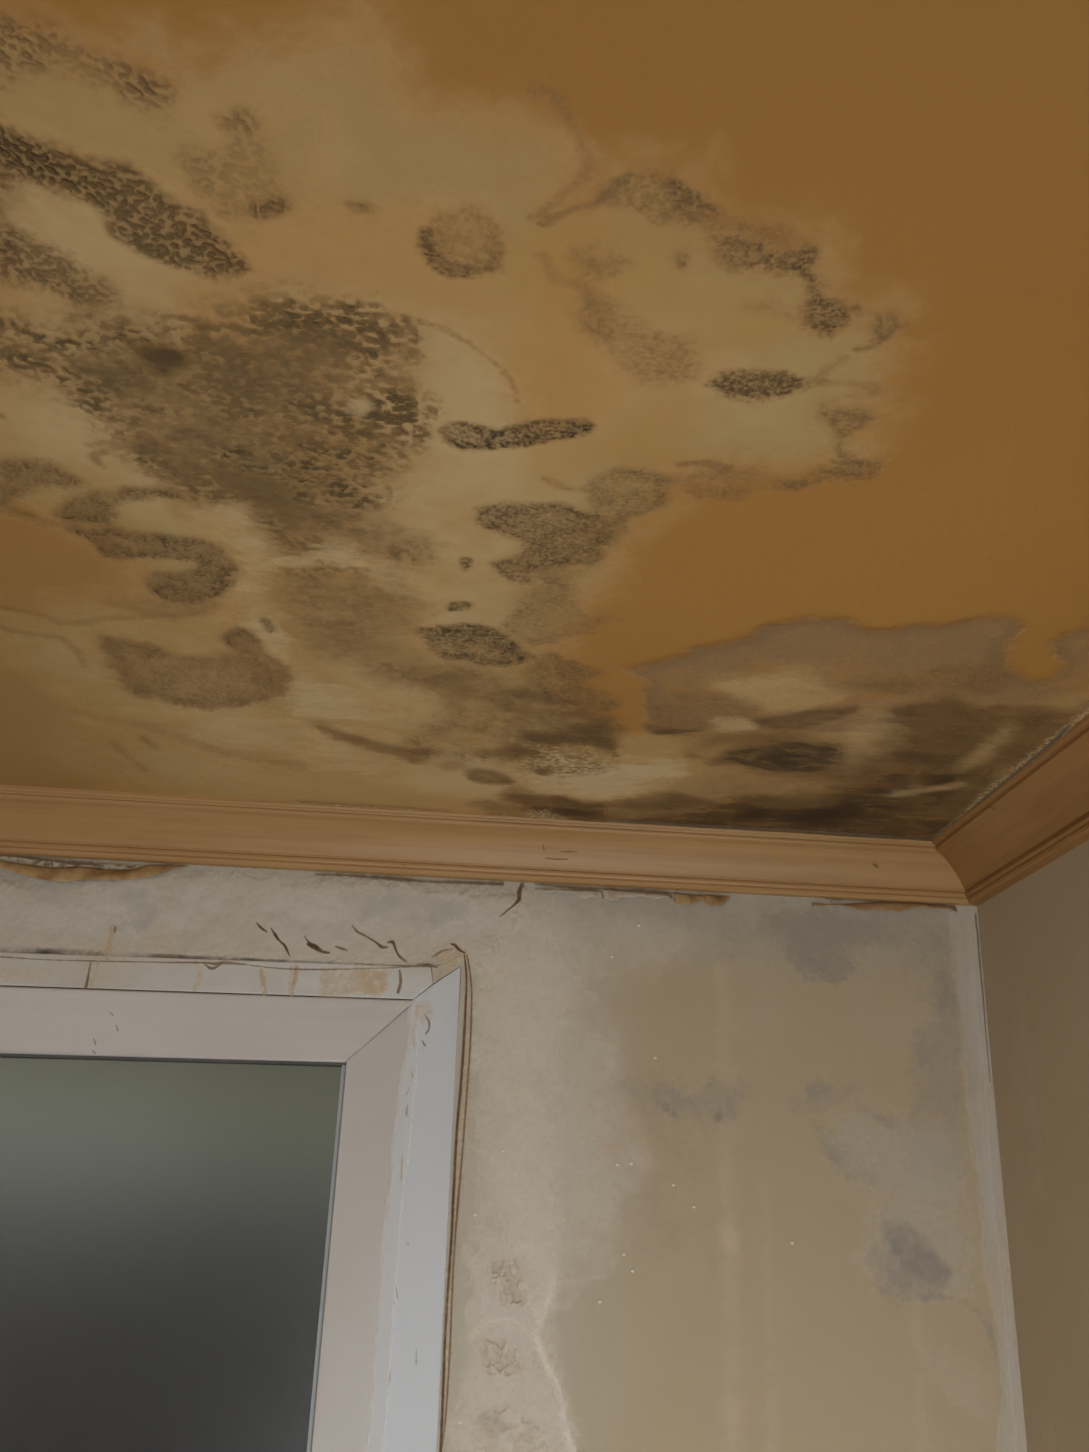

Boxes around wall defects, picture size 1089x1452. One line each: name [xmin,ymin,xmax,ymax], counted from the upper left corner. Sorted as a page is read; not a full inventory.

damp [0,23,1089,839]
spalling [0,854,144,870]
spalling [315,873,504,886]
spalling [535,883,674,895]
crack [256,922,472,1452]
damp [479,1239,576,1452]